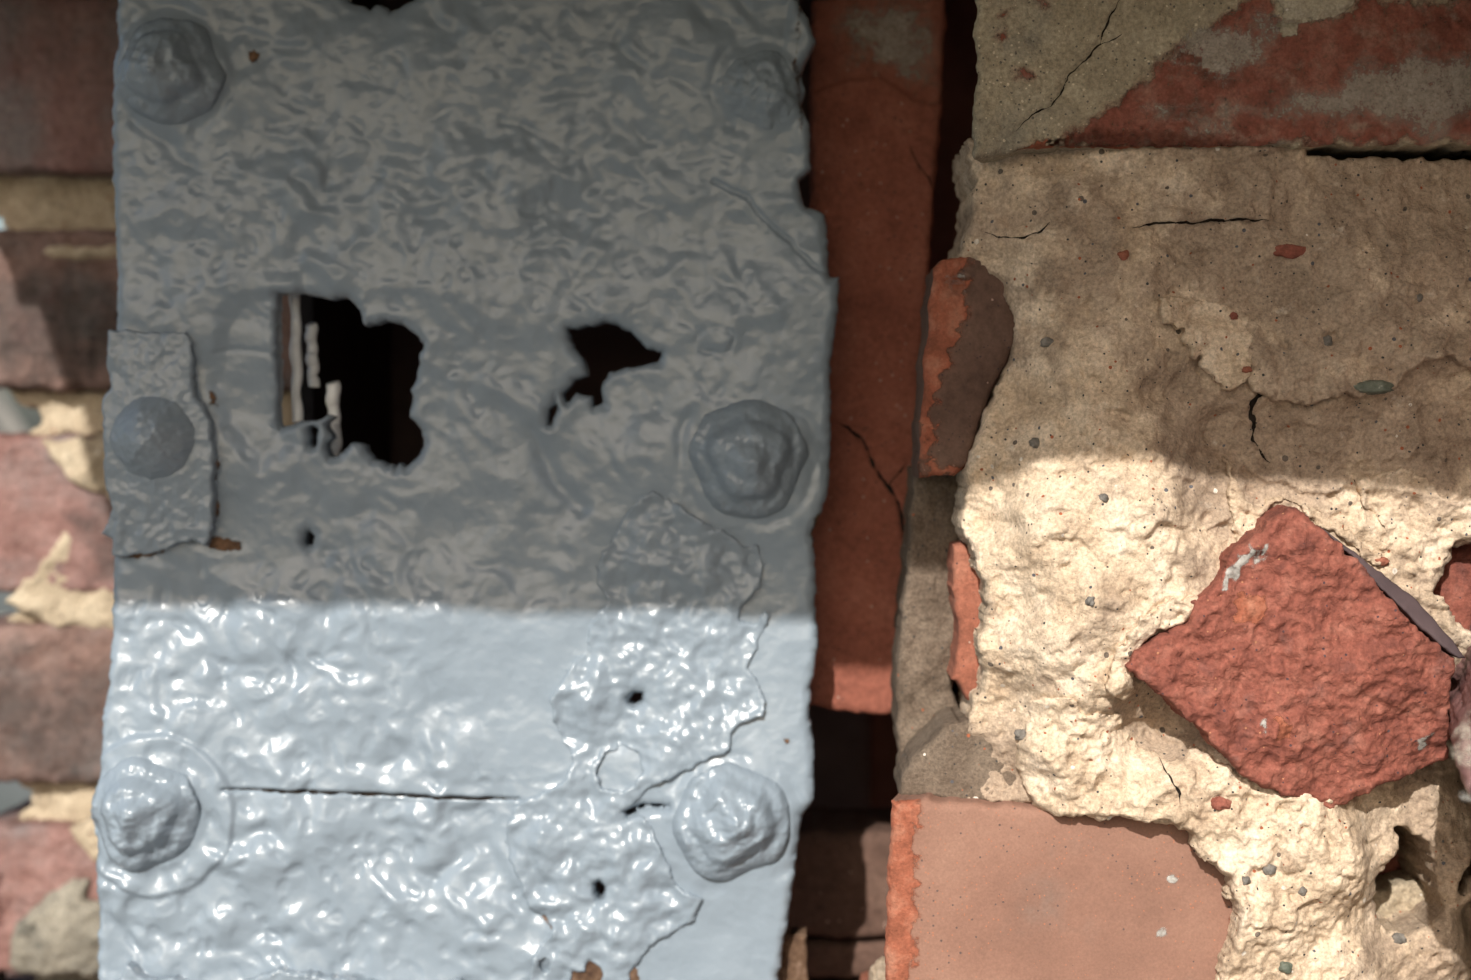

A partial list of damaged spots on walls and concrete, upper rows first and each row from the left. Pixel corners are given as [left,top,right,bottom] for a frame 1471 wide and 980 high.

crack [1016,1,1122,131]
spalling [1019,0,1471,150]
crack [1133,218,1266,228]
crack [833,422,907,538]
crack [1248,393,1270,463]
rust [571,960,603,980]